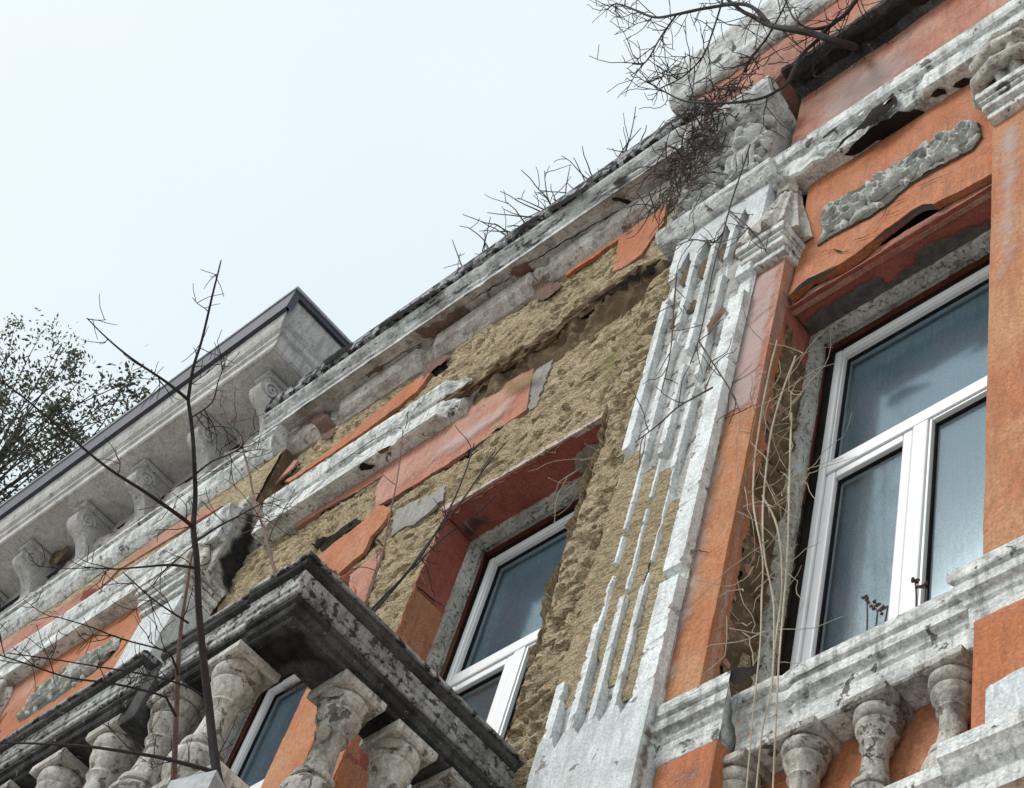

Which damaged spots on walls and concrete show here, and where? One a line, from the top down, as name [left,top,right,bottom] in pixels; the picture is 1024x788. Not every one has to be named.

spalling [822,93,925,156]
spalling [217,224,741,788]
spalling [720,324,806,697]